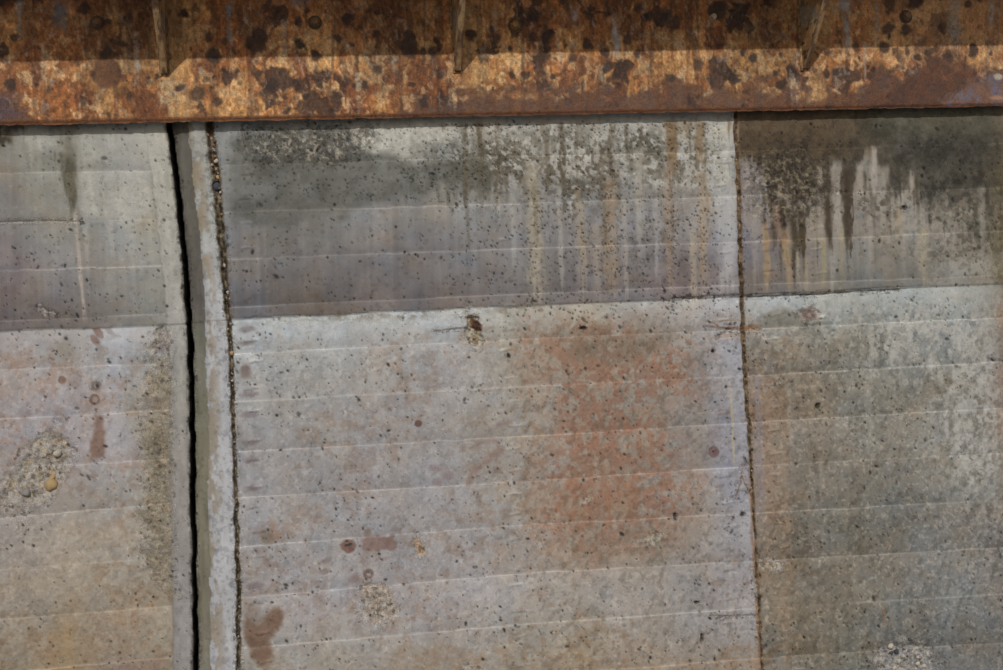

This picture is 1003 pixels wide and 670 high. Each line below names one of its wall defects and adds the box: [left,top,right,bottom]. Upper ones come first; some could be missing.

rust [240,23,272,56]
rust [857,50,983,108]
spalling [0,415,81,533]
damp [1,122,164,387]
damp [221,113,663,271]
spalling [457,303,488,355]
damp [705,340,755,556]
rust [750,372,801,670]
crack [668,111,903,670]
damp [755,144,1003,670]
spalling [353,580,401,634]
spalling [863,632,946,670]